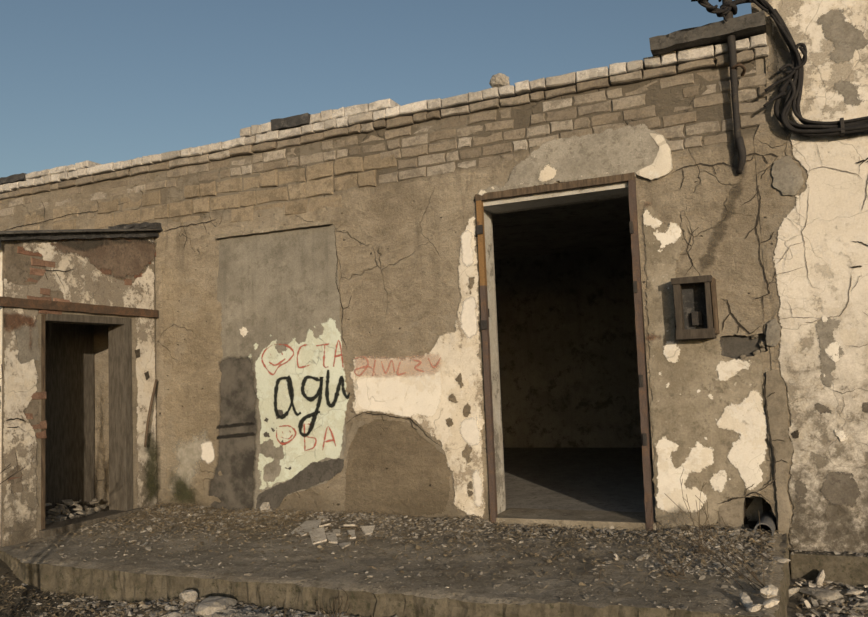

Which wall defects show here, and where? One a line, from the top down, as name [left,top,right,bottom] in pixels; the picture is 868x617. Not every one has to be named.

peeling [817,9,868,63]
peeling [833,80,864,107]
peeling [477,124,673,195]
flaking render [2,240,70,364]
crack [334,231,352,354]
crack [671,146,868,334]
flaking render [7,465,23,494]
flaking render [23,391,47,439]
flaking render [50,237,223,515]
peeling [249,217,485,523]
peeling [632,205,772,576]
crack [719,377,788,504]